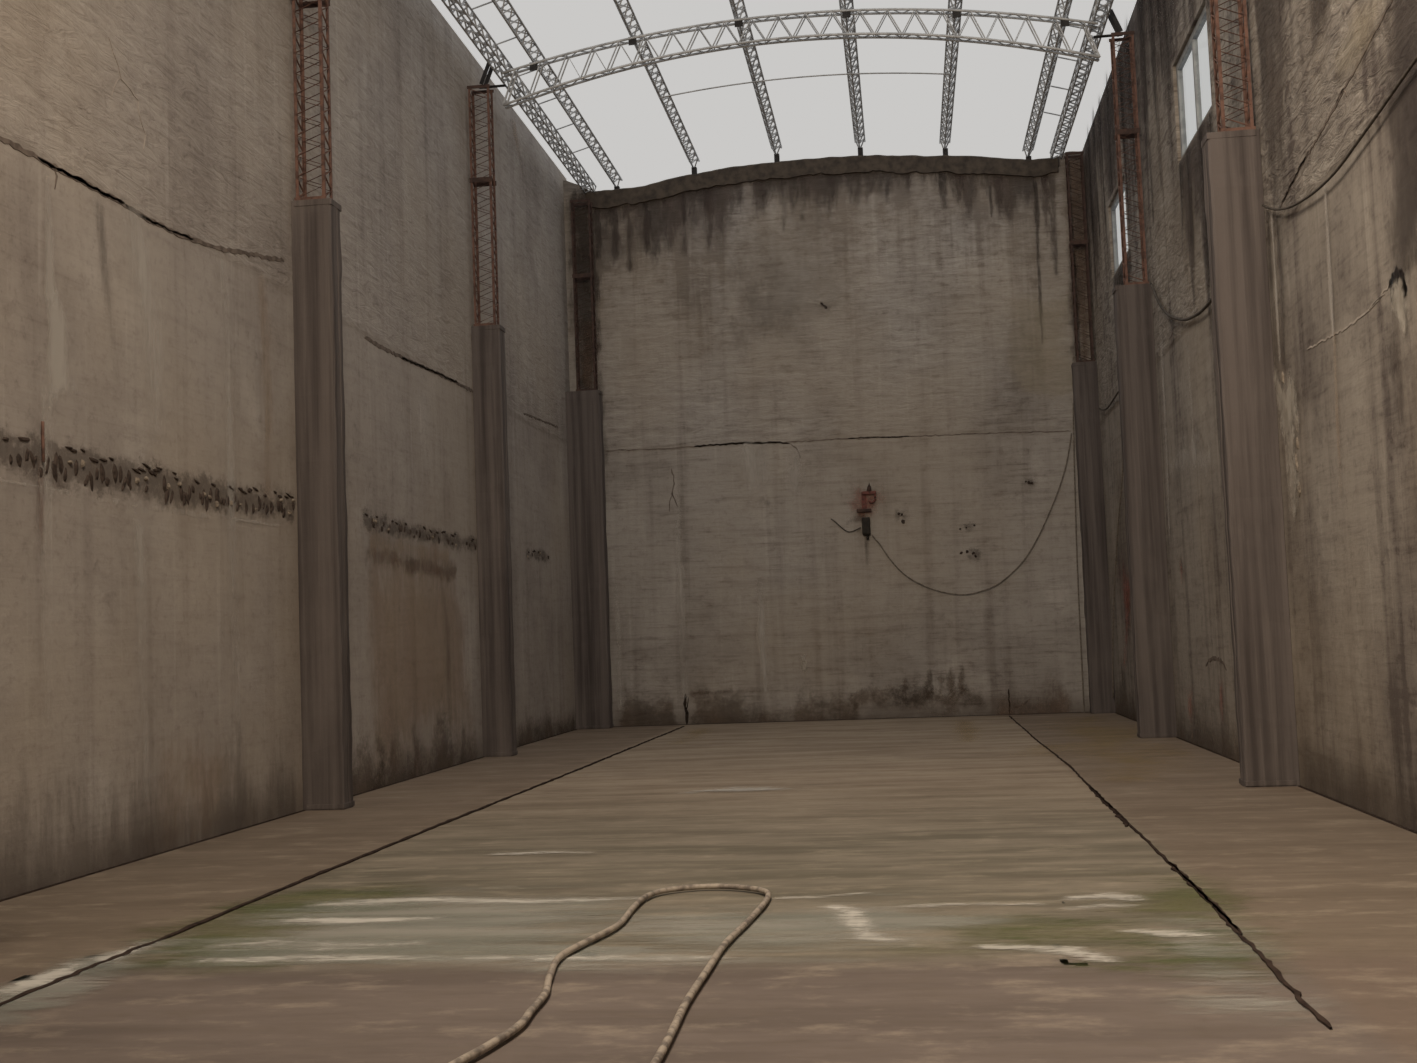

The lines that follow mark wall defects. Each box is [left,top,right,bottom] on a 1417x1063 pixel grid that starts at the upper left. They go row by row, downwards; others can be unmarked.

damp [1255,0,1282,162]
crack [0,136,284,262]
damp [595,171,910,254]
damp [939,172,1055,242]
damp [1391,279,1405,331]